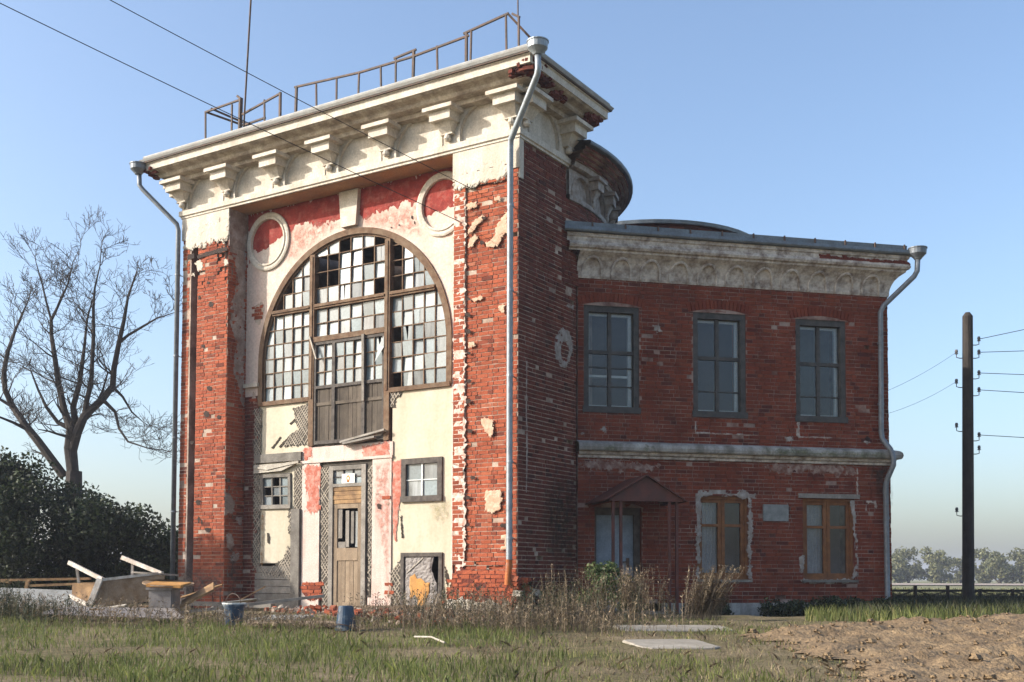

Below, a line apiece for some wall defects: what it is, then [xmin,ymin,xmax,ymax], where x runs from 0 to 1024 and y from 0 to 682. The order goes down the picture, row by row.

peeling [183,216,230,277]
peeling [360,159,541,612]
peeling [303,446,321,513]
flaking render [693,489,757,580]
spalling [300,581,338,617]